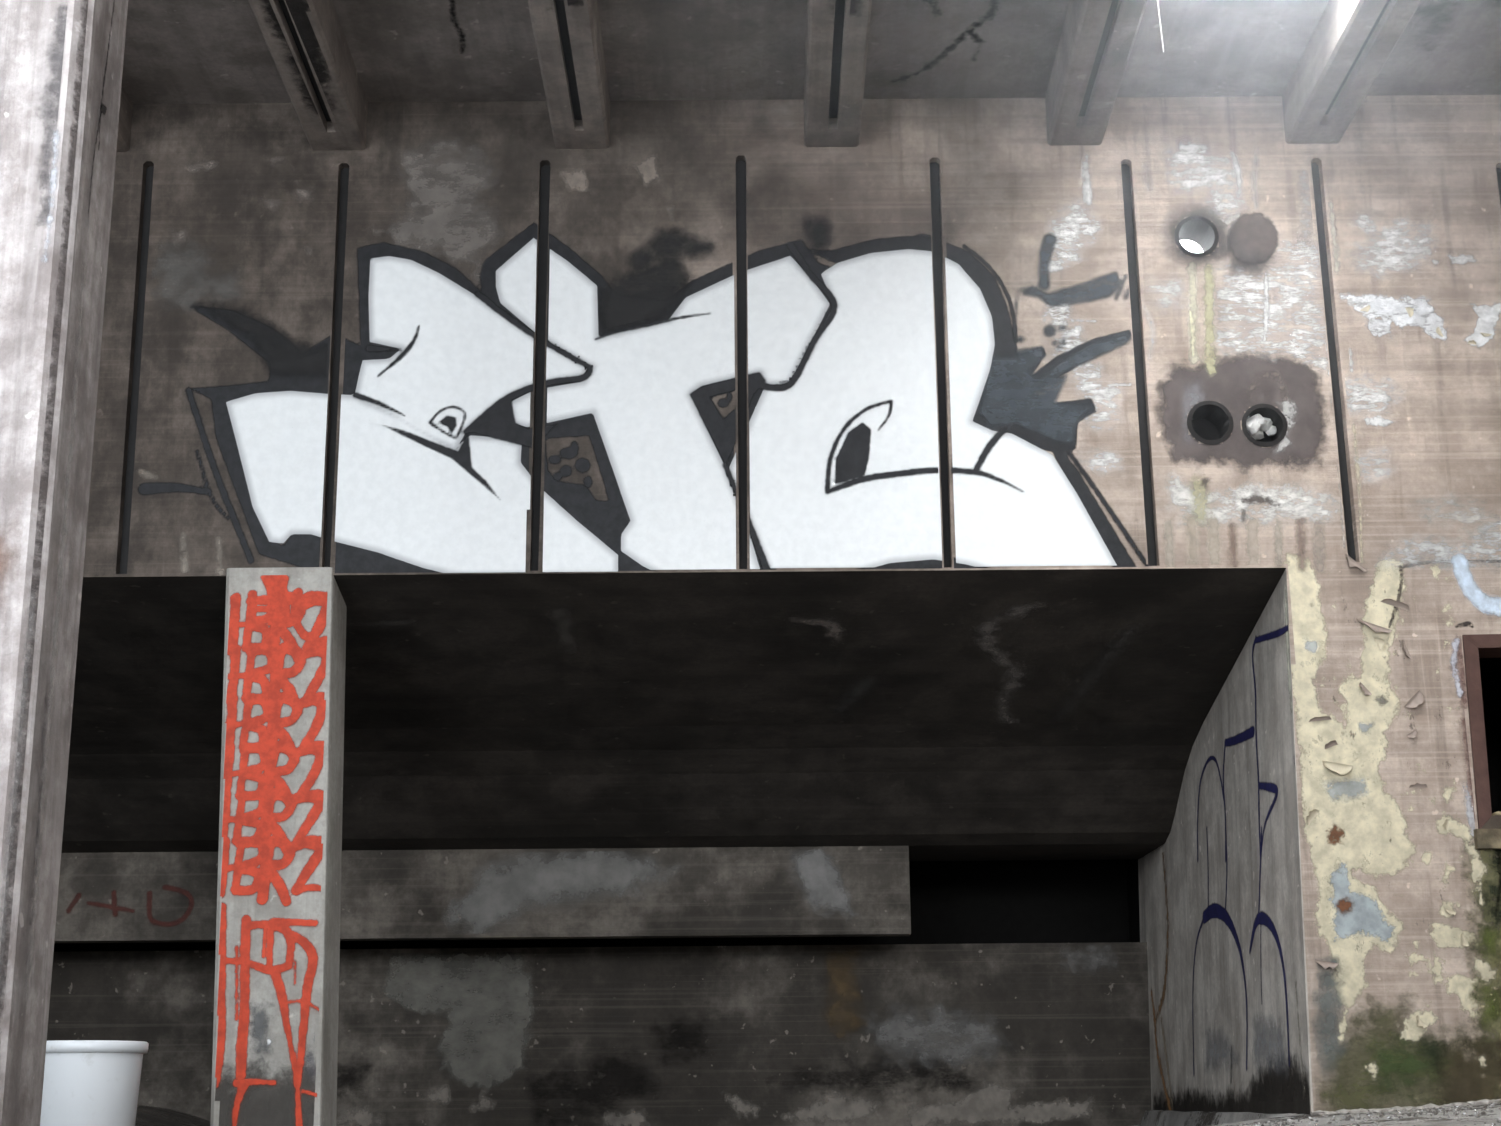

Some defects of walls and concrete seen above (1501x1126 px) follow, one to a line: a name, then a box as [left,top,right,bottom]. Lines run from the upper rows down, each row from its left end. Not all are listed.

crack [449,0,465,53]
peeling [1340,293,1447,340]
peeling [1465,302,1501,347]
peeling [1284,552,1498,1041]